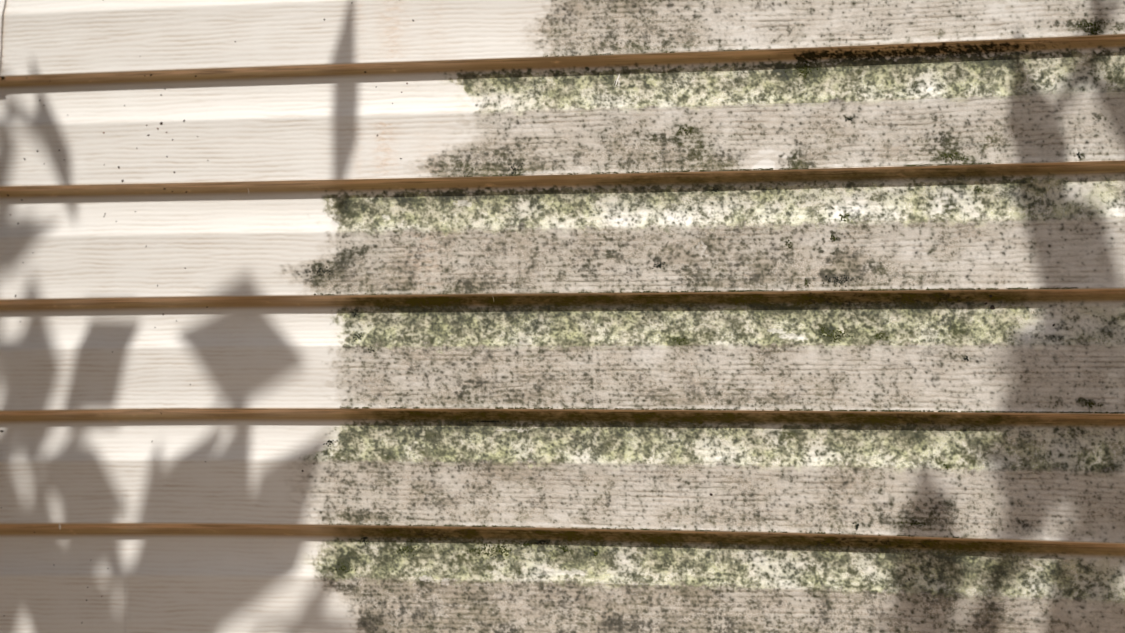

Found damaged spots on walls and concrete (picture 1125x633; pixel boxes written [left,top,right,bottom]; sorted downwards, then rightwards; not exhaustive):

damp [284,0,1125,633]